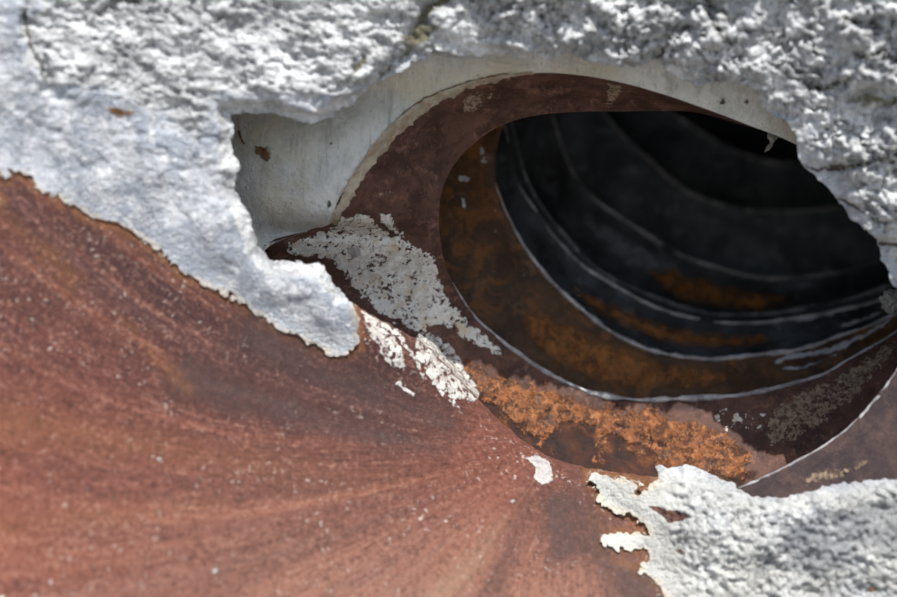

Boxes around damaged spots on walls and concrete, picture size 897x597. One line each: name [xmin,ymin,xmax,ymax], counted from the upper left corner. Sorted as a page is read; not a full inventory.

rust [398,73,508,118]
peeling [463,91,494,112]
peeling [583,217,678,273]
peeling [287,213,501,408]
rust [584,295,764,348]
rust [649,270,788,311]
rust [527,316,722,388]
rust [464,359,755,485]
peeling [526,454,553,485]
spalling [649,506,690,523]